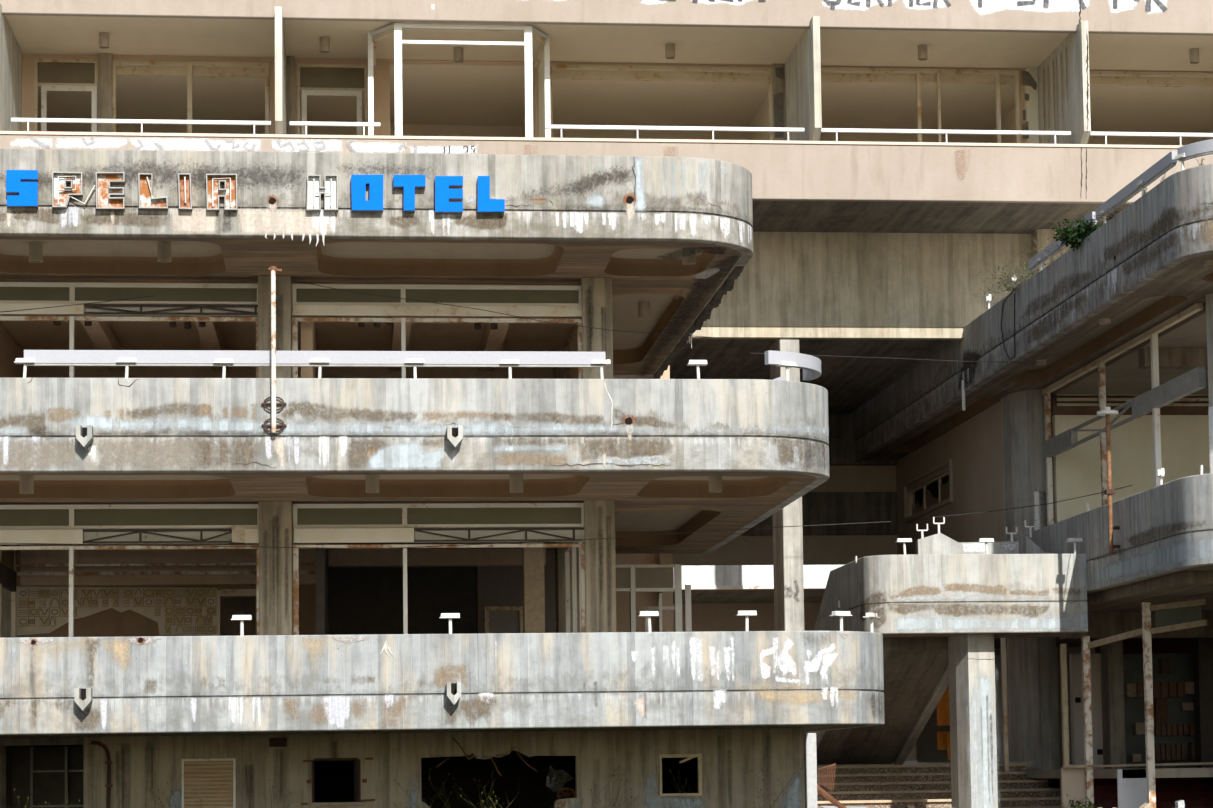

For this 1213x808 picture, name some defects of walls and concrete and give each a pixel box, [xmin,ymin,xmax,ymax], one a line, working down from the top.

water stain [0,203,335,235]
water stain [390,210,506,234]
water stain [1104,208,1213,292]
water stain [0,403,669,468]
water stain [860,584,1086,630]
water stain [652,638,734,709]
water stain [760,662,853,704]
water stain [76,699,107,730]
efflorescence [228,697,261,726]
water stain [313,696,362,728]
water stain [384,695,405,723]
water stain [446,693,496,720]